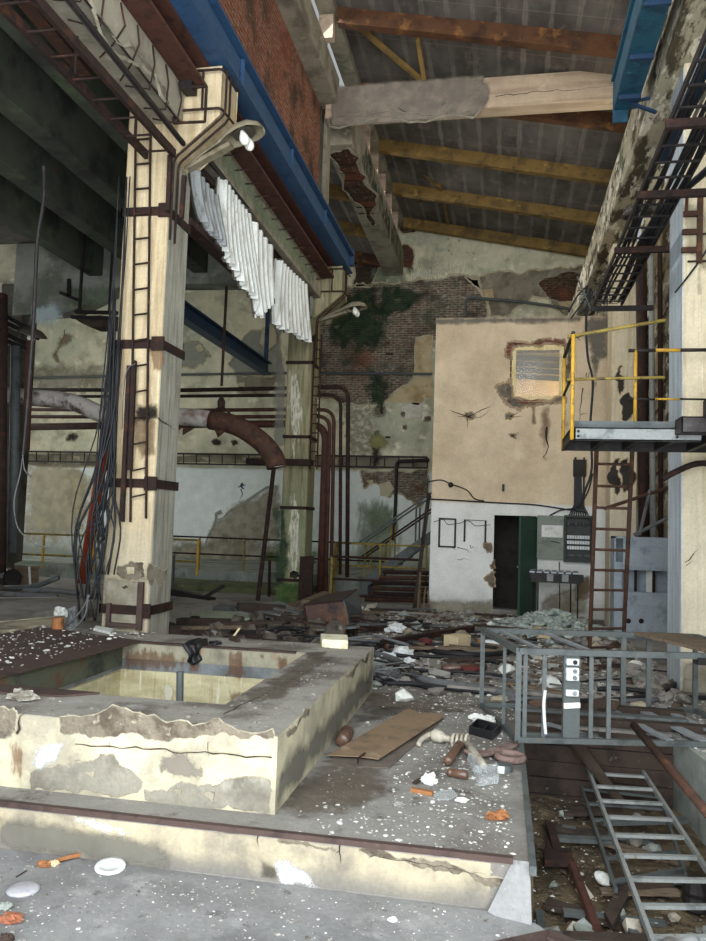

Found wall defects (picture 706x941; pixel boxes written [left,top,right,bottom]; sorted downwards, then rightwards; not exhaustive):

spalling [330,147,379,227]
damp [686,206,706,267]
flaking render [317,227,584,418]
crack [452,406,519,439]
flaking render [335,457,430,508]
spalling [116,560,167,589]
flaking render [0,643,370,742]
crack [75,742,272,758]
flaking render [29,753,272,814]
crack [382,857,483,874]